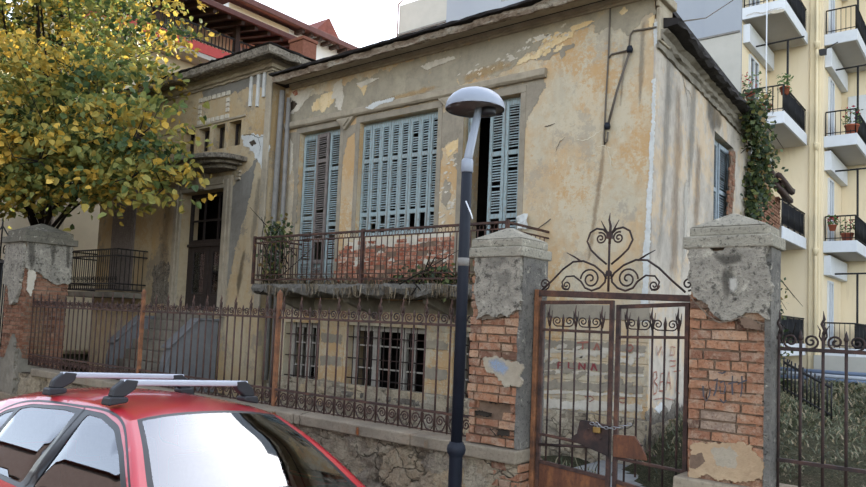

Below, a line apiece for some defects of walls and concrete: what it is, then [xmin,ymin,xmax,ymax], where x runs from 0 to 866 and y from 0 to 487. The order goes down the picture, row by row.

flaking render [286,0,658,225]
leakage [708,104,720,129]
flaking render [226,133,270,295]
flaking render [334,111,459,284]
flaking render [640,78,656,304]
flaking render [26,269,37,296]
leakage [720,256,739,294]
flaking render [483,356,525,388]
flaking render [688,441,765,483]